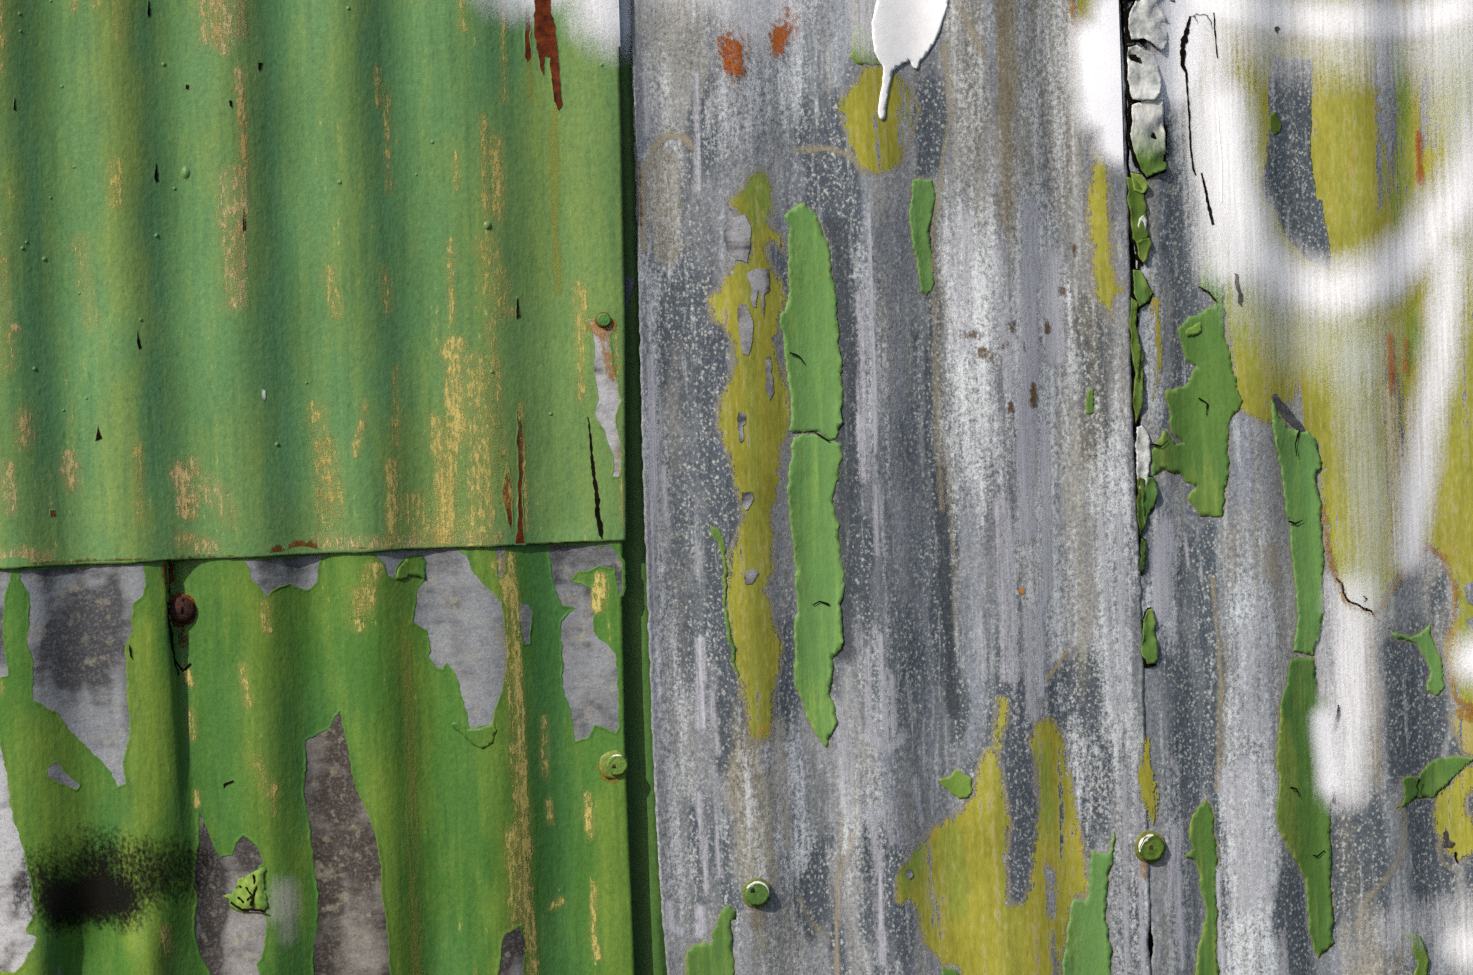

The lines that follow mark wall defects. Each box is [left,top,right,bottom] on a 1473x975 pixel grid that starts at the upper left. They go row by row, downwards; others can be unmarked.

corrosion [523,0,564,111]
corrosion [717,32,748,77]
corrosion [769,7,794,55]
crack [1120,0,1222,225]
crack [1128,233,1141,437]
peeling [1124,0,1243,576]
corrosion [501,409,527,545]
crack [587,417,603,539]
peeling [375,547,535,729]
peeling [546,543,626,744]
peeling [1271,393,1335,958]
crack [1147,922,1155,962]